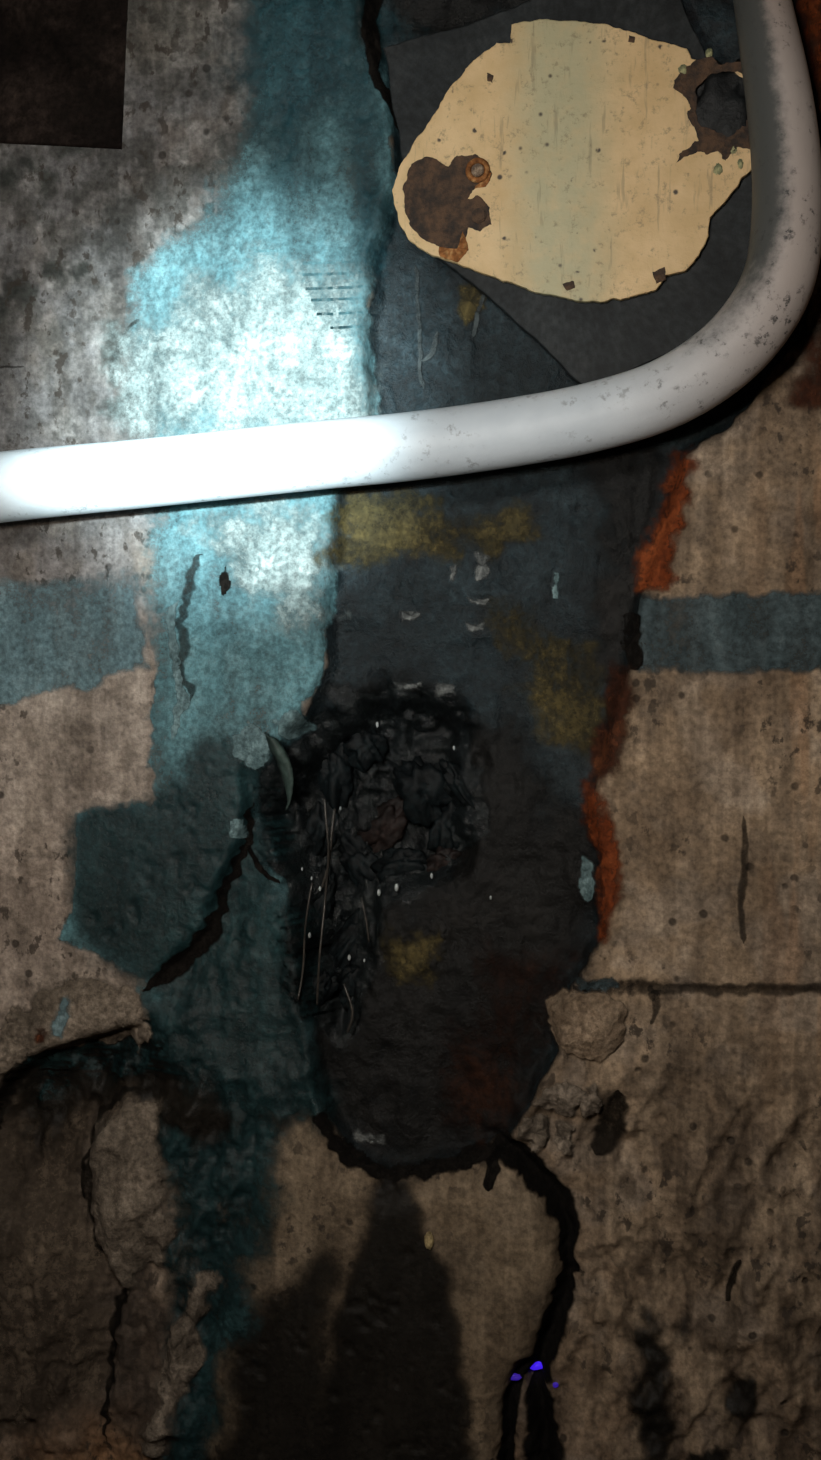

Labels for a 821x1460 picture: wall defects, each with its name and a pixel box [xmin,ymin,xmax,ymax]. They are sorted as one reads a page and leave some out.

rust [636,452,698,591]
crack [142,803,280,1031]
crack [738,816,748,944]
crack [573,976,821,1024]
crack [0,1046,85,1129]
crack [81,1086,144,1251]
leakage [20,737,473,1460]
crack [100,1288,131,1441]